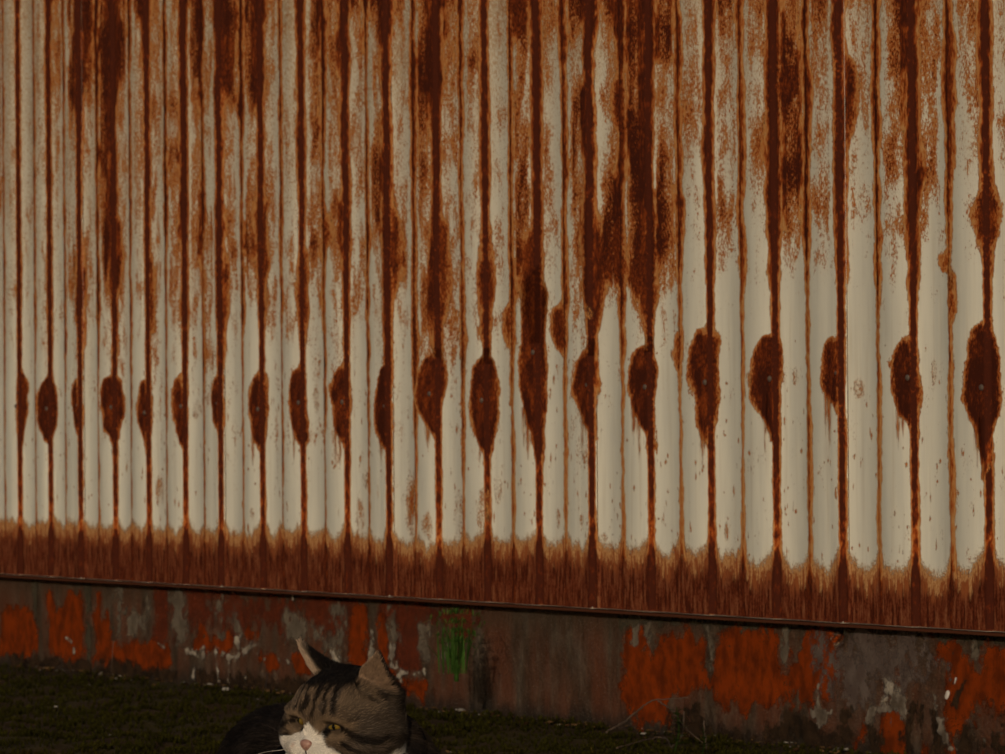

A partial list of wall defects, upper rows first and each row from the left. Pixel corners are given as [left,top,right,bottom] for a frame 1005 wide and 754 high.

corrosion [617,618,843,733]
peeling [810,682,833,729]
peeling [861,688,907,726]
peeling [933,677,958,751]
corrosion [930,634,1005,754]